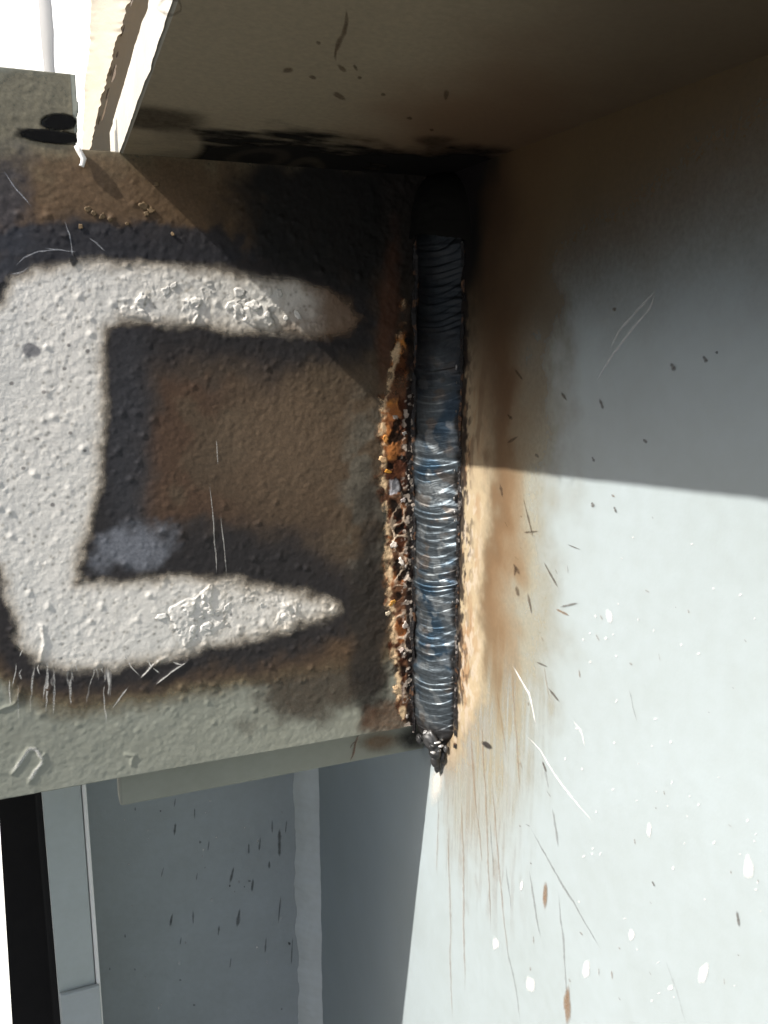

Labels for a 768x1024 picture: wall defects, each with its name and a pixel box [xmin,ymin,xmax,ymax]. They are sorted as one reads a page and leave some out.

corrosion [376,323,415,726]